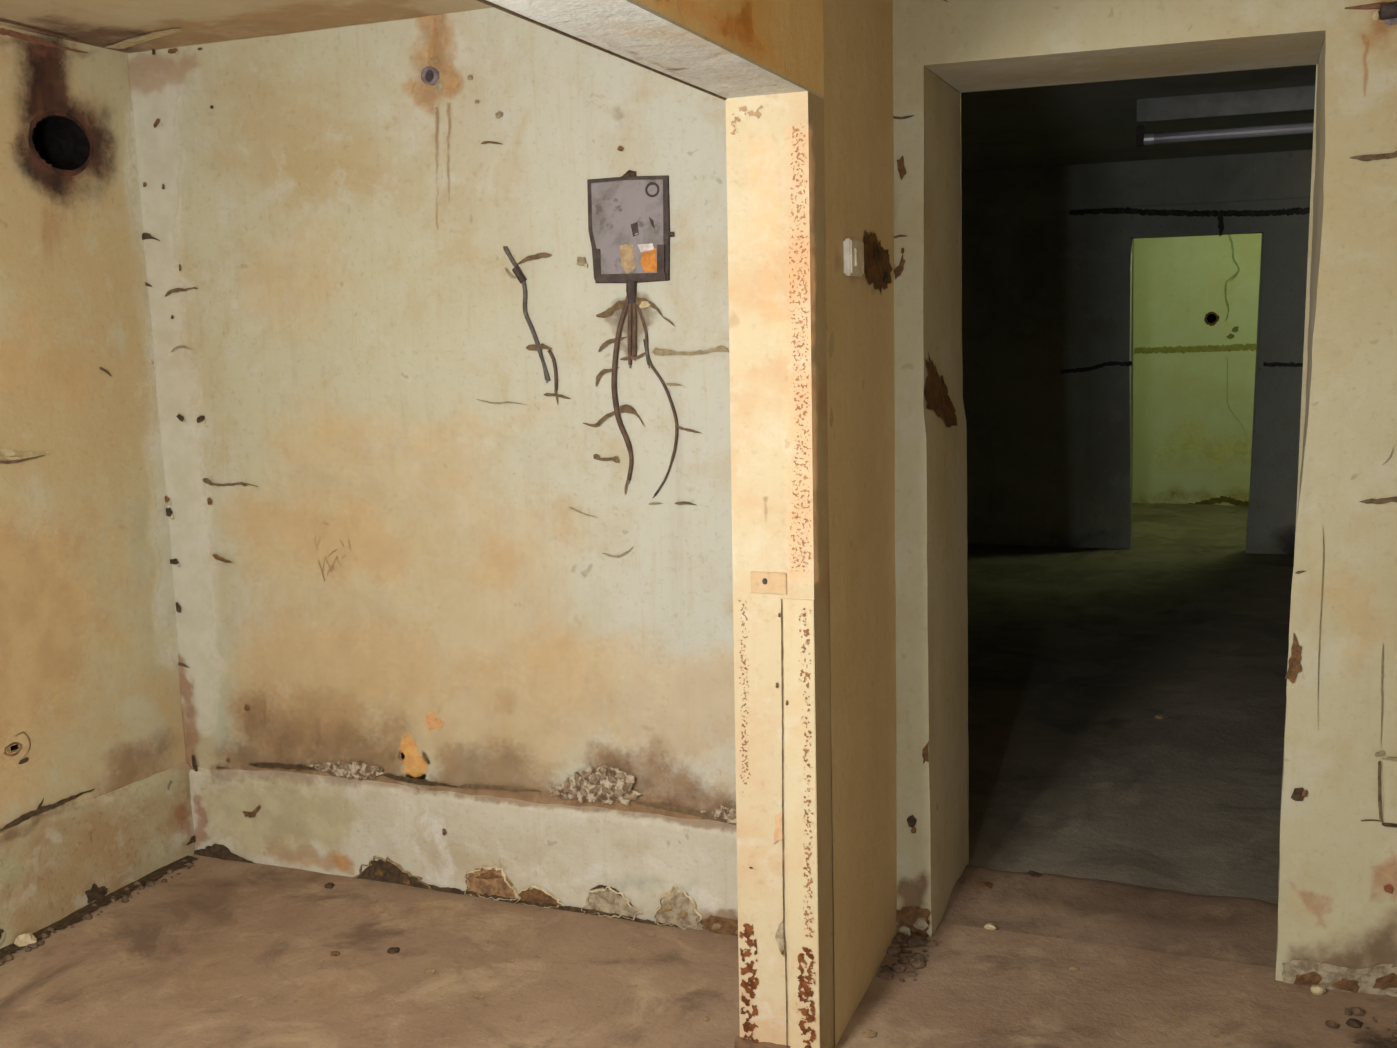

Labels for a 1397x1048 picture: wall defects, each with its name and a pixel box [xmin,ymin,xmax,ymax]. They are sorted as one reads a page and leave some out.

rust [413,14,460,103]
crack [503,246,551,279]
rust [789,126,811,572]
crack [477,297,729,505]
leakage [225,698,398,784]
crack [0,789,94,831]
flaking render [549,765,641,806]
leakage [565,750,736,825]
flaking render [464,865,738,936]
rust [740,923,759,1044]
flaking render [1282,960,1397,997]
leakage [1295,925,1397,969]